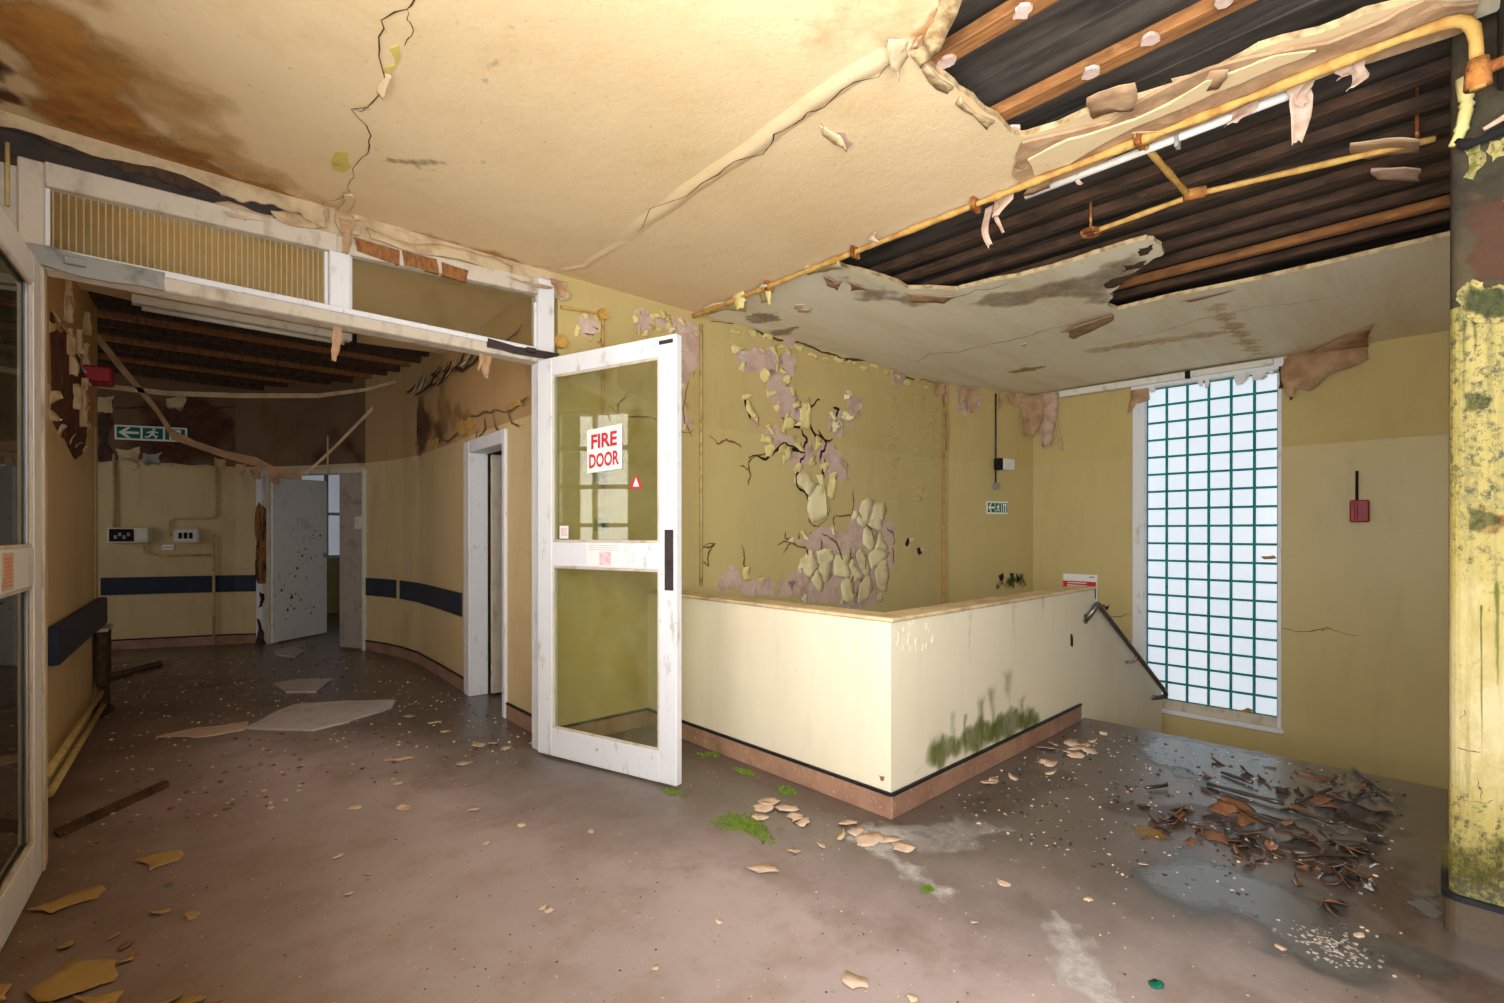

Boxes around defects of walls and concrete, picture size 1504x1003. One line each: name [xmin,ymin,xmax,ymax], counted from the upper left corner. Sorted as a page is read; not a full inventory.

leakage [0,0,302,218]
peeling [0,126,572,301]
crack [322,0,415,212]
spalling [804,261,956,304]
spalling [887,0,995,130]
peeling [981,0,1479,249]
peeling [1456,199,1504,324]
peeling [1463,138,1504,180]
peeling [49,279,237,471]
peeling [633,284,935,610]
leakage [1467,394,1490,410]
leakage [1470,510,1499,530]